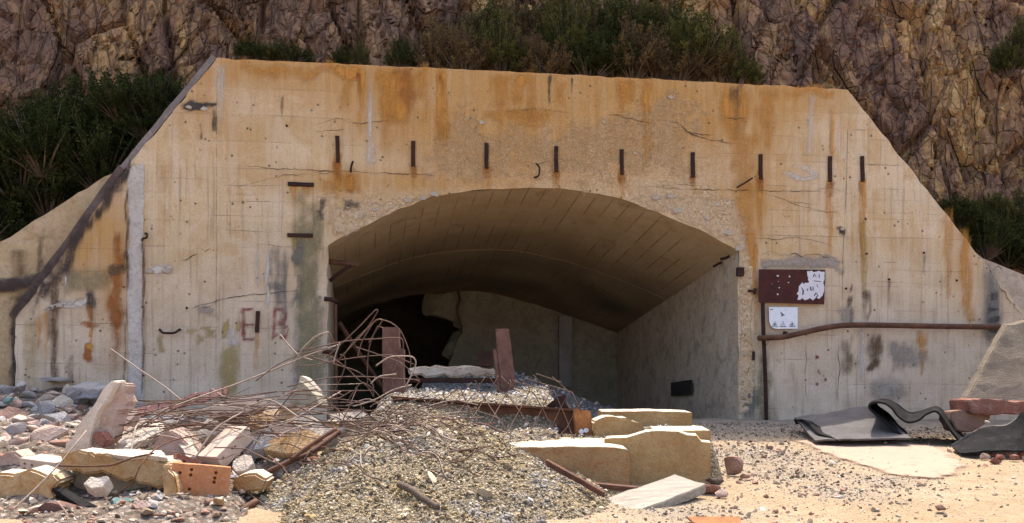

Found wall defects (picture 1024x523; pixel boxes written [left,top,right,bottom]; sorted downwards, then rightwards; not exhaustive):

spalling [183,100,216,111]
corrosion [244,64,449,141]
corrosion [334,154,359,191]
corrosion [82,192,130,380]
water stain [258,200,325,387]
corrosion [859,182,867,299]
corrosion [961,236,972,320]
water stain [846,331,923,376]